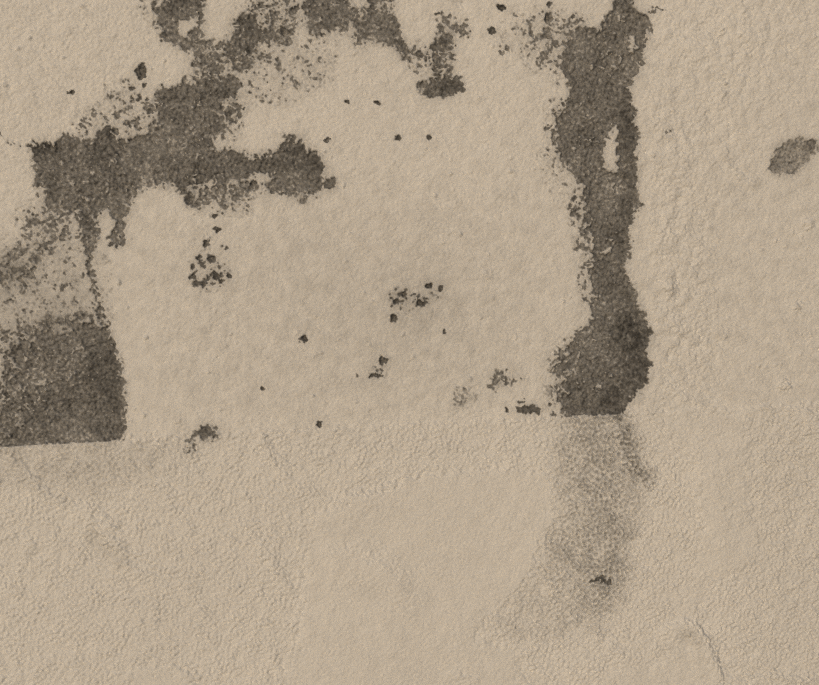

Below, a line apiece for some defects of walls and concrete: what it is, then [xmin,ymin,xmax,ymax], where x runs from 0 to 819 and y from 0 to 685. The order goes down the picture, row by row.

crack [0,132,62,157]
peeling [0,0,471,447]
peeling [511,0,664,417]
spalling [768,136,819,175]